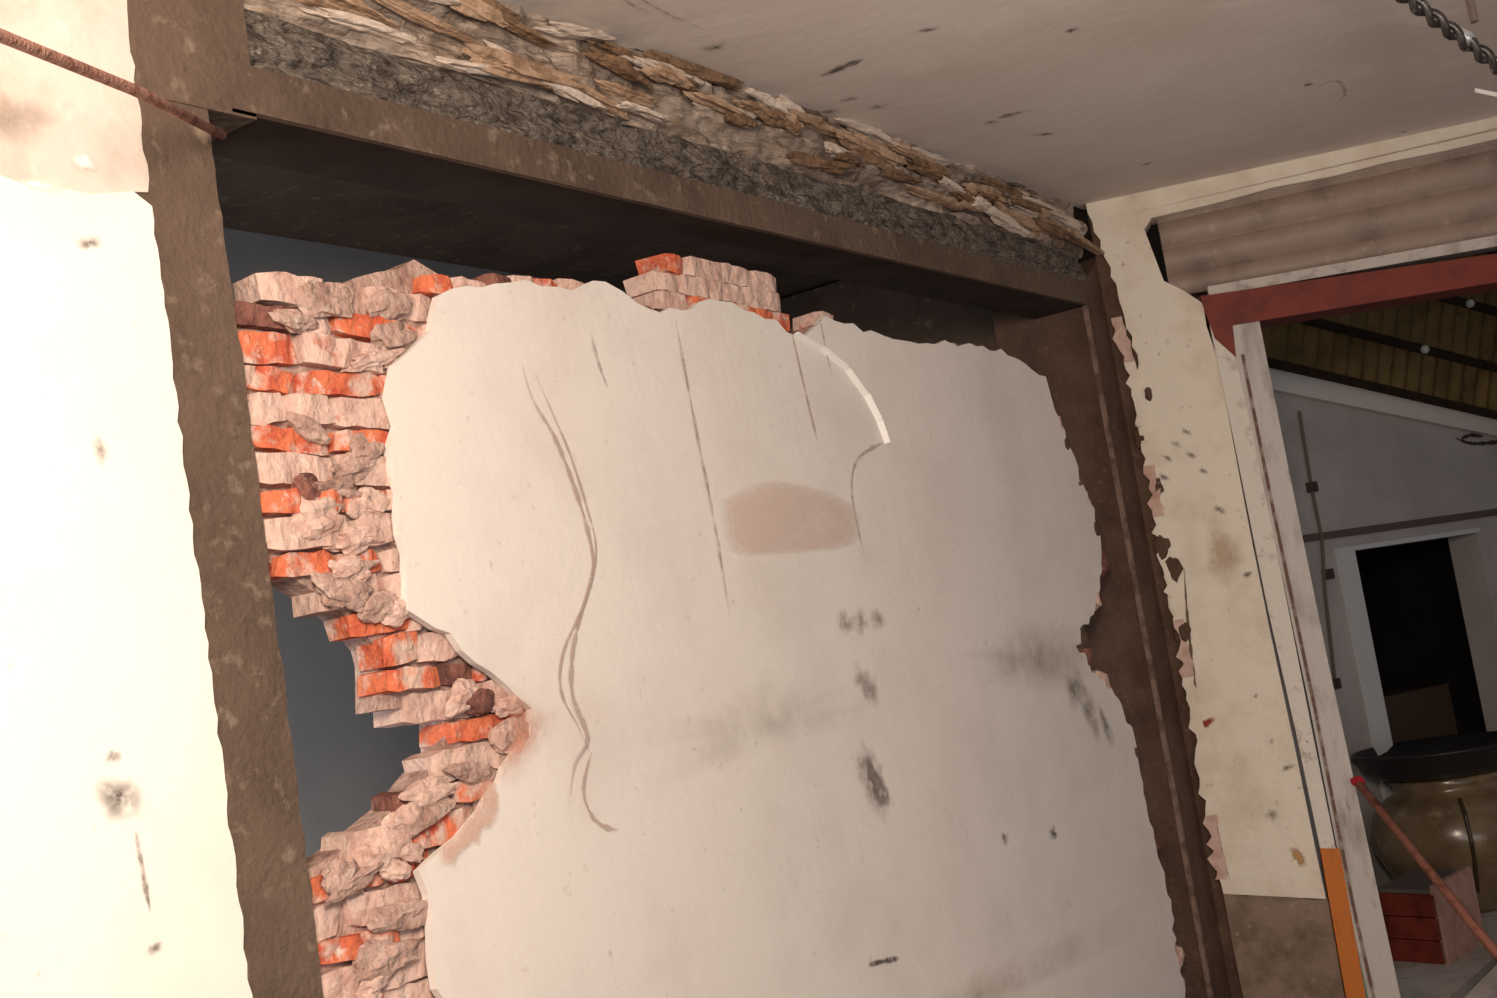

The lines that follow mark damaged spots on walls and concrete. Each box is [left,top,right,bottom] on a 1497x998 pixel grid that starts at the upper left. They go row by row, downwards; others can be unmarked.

flaking render [243,0,1105,259]
flaking render [232,272,585,998]
crack [543,417,611,830]
flaking render [1111,316,1227,880]